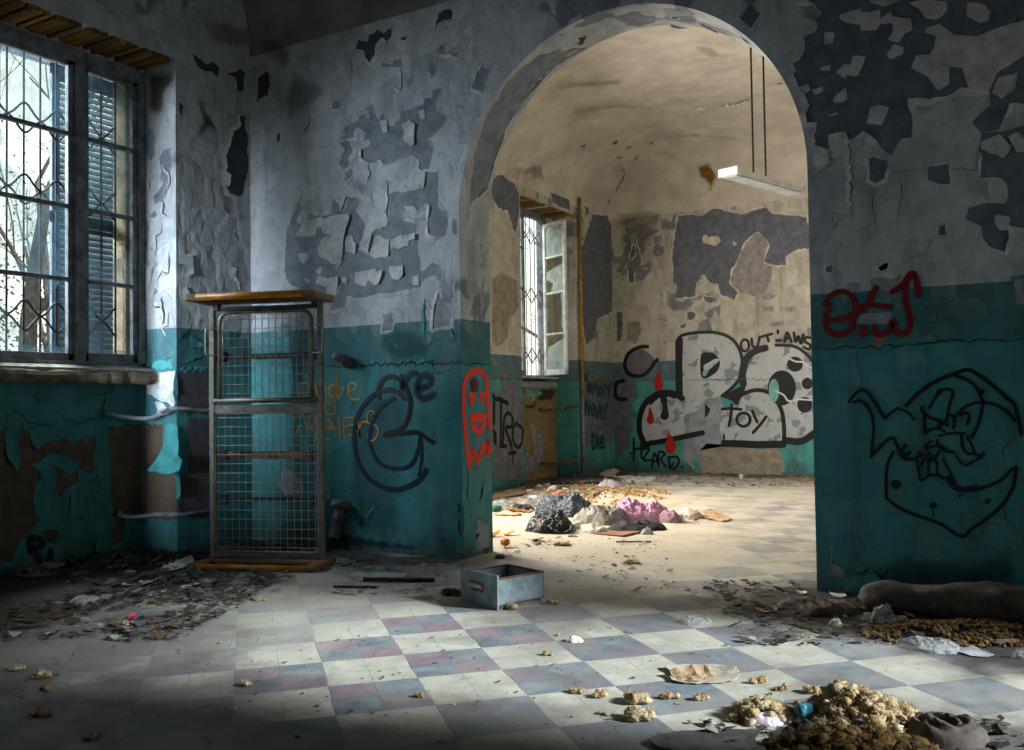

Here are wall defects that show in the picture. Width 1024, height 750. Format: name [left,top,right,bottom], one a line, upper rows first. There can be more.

peeling [178,234,194,301]
peeling [193,53,271,103]
peeling [218,114,250,222]
peeling [282,88,457,349]
peeling [356,25,408,68]
peeling [466,35,587,237]
peeling [582,206,642,345]
rust [700,166,715,185]
peeling [670,206,809,329]
peeling [787,0,1024,256]
crack [813,333,1024,384]
peeling [0,360,210,566]